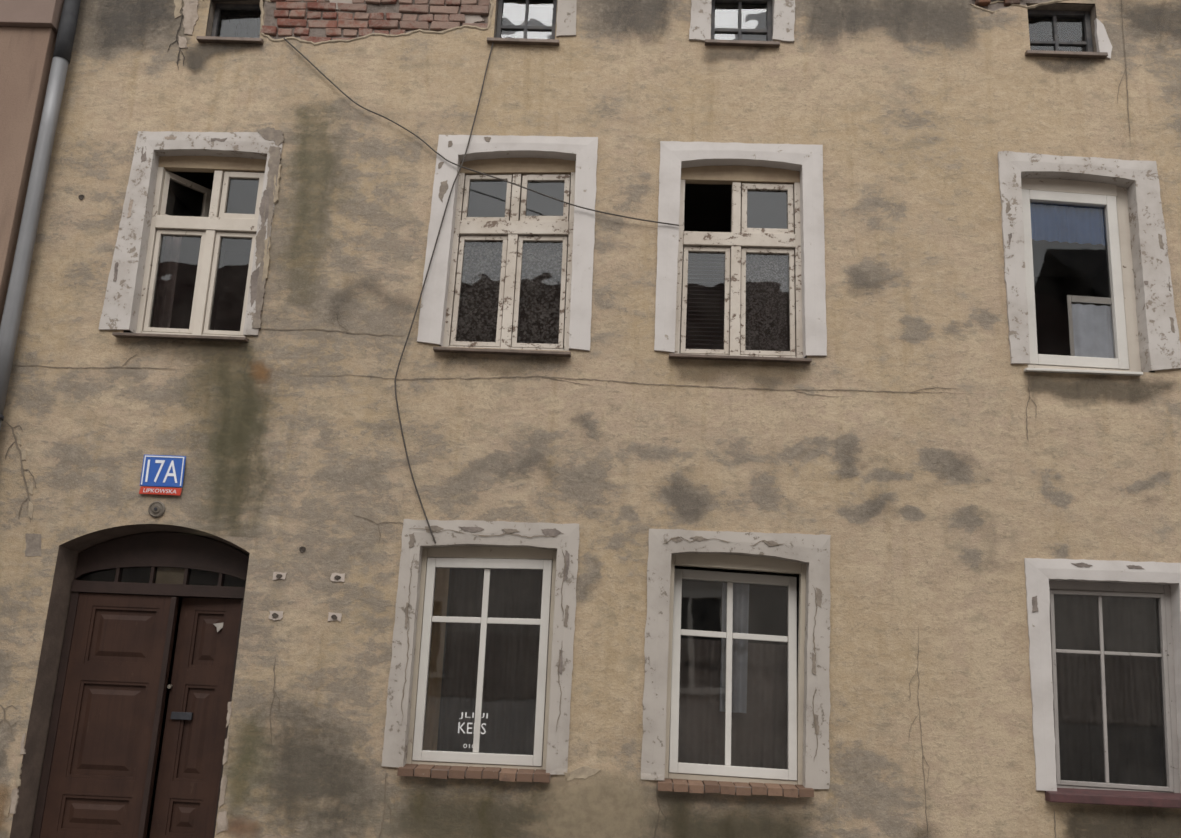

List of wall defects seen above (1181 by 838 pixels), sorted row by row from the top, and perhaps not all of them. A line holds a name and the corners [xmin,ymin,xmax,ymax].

spalling [174,0,199,48]
spalling [260,0,494,46]
spalling [969,0,1078,14]
spalling [250,127,284,329]
crack [4,421,36,522]
crack [908,624,929,832]
water stain [409,798,533,838]
water stain [673,813,799,838]
water stain [1067,808,1181,838]